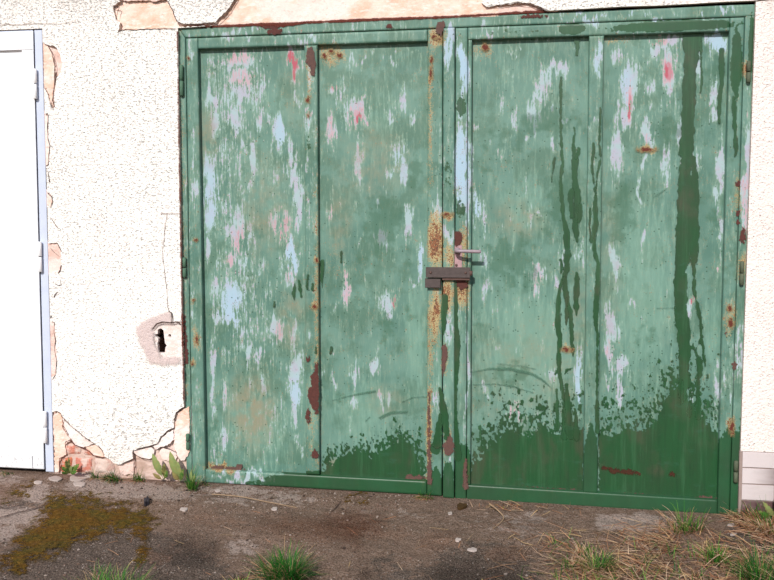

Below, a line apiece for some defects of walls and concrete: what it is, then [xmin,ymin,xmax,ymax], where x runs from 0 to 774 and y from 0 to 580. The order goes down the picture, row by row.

flaking render [113,0,558,33]
peeling [305,46,316,76]
flaking render [43,43,62,208]
flaking render [48,243,62,273]
spalling [136,311,184,365]
peeling [307,362,320,410]
flaking render [49,404,192,481]
peeling [442,435,455,456]